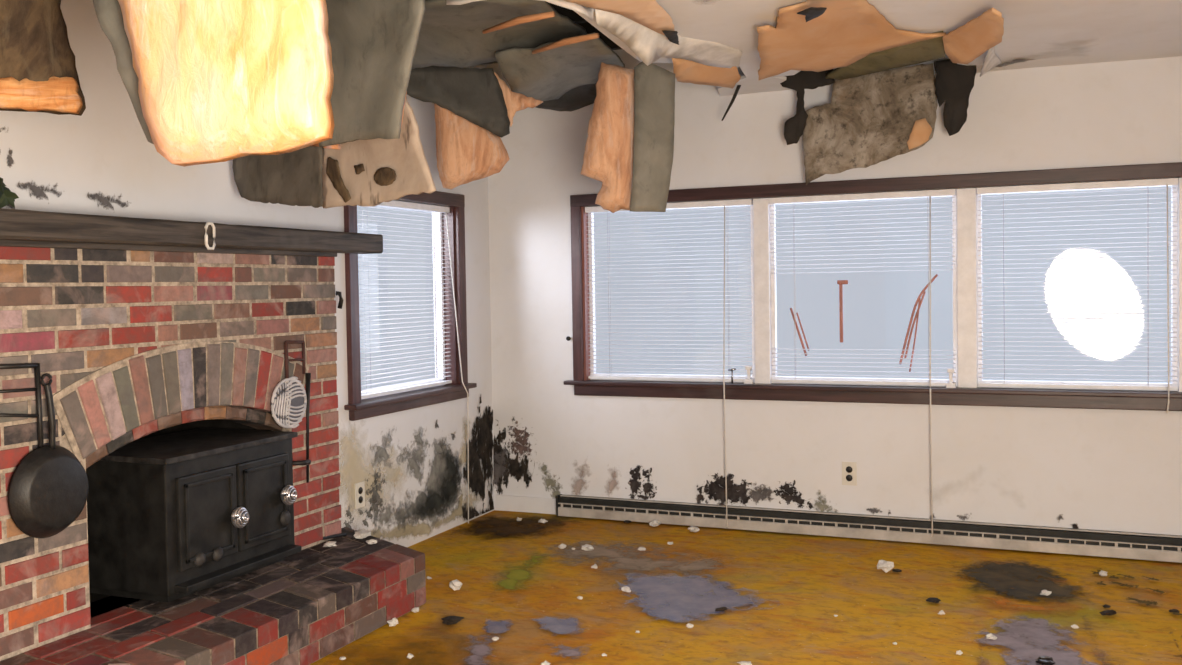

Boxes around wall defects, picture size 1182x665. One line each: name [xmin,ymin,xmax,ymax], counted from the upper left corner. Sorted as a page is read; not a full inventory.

water stain [340,395,586,539]
water stain [608,465,657,500]
mould [695,473,837,513]
water stain [550,541,722,576]
water stain [958,561,1084,602]